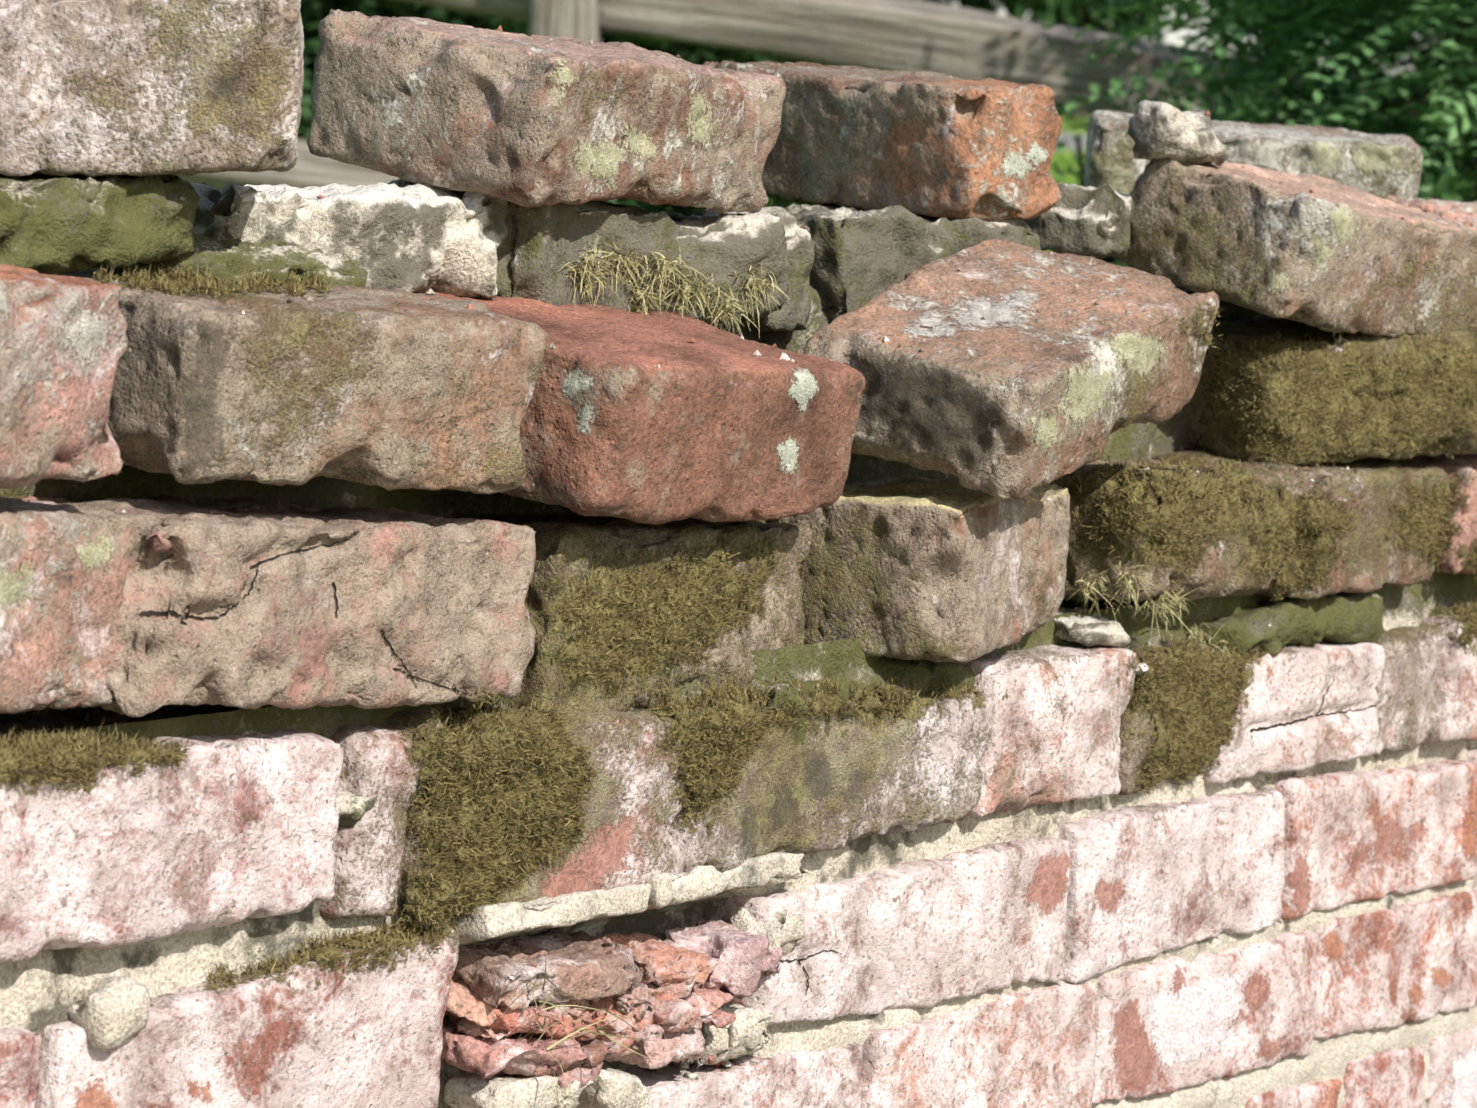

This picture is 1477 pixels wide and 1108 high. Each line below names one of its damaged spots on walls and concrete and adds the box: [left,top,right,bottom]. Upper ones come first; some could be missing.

crack [140,539,350,620]
crack [381,630,467,695]
spalling [441,904,806,1108]